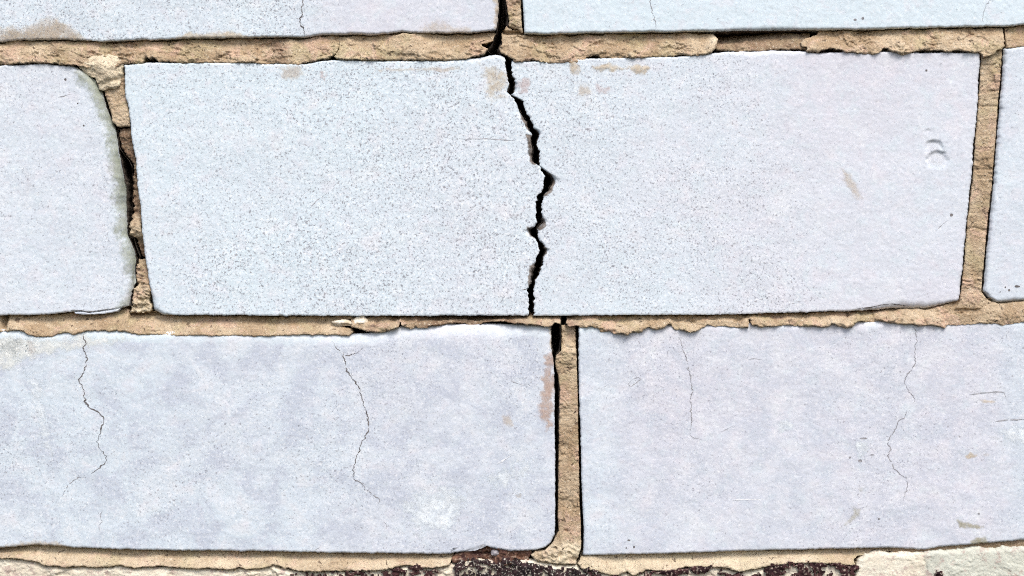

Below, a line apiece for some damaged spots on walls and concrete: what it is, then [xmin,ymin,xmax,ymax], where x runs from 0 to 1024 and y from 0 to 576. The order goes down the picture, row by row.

crack [115,0,981,534]
crack [981,50,1003,290]
crack [62,334,107,496]